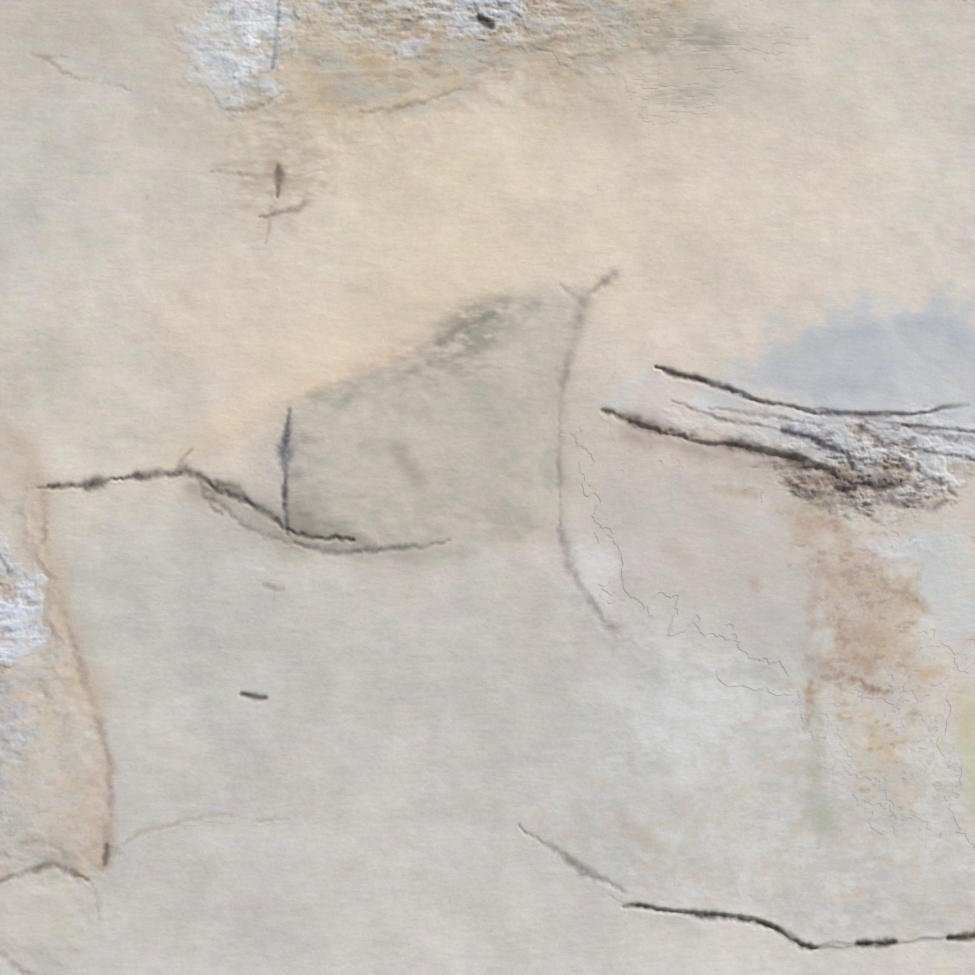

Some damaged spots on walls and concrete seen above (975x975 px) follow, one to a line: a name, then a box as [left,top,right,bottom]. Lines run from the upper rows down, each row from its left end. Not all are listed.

spalling [152,0,709,171]
crack [540,262,625,658]
flaking render [583,340,975,435]
crack [598,356,975,527]
damp [742,276,975,403]
flaking render [821,419,975,496]
peeling [0,529,76,858]
crack [0,406,453,923]
corrosion [780,475,952,836]
crack [0,943,49,975]
crack [514,822,975,959]